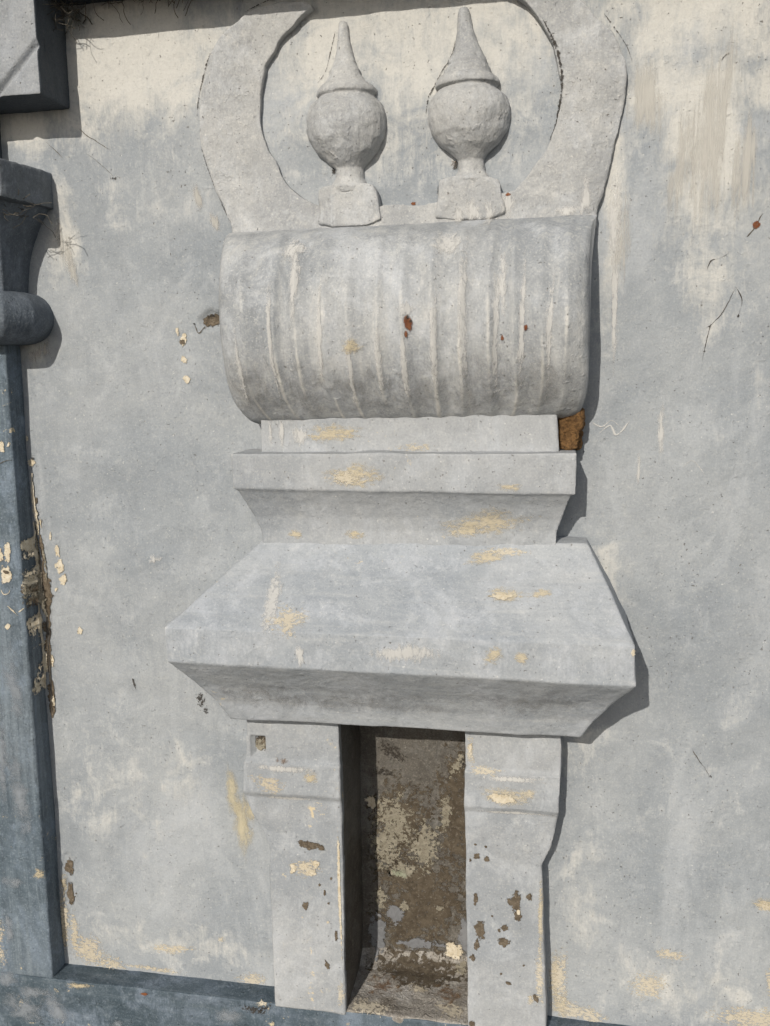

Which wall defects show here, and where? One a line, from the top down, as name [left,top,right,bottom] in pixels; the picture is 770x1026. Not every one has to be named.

flaking render [176,312,220,384]
flaking render [0,457,67,718]
peeling [290,840,342,955]
peeling [364,738,607,1022]
peeling [337,983,394,1019]